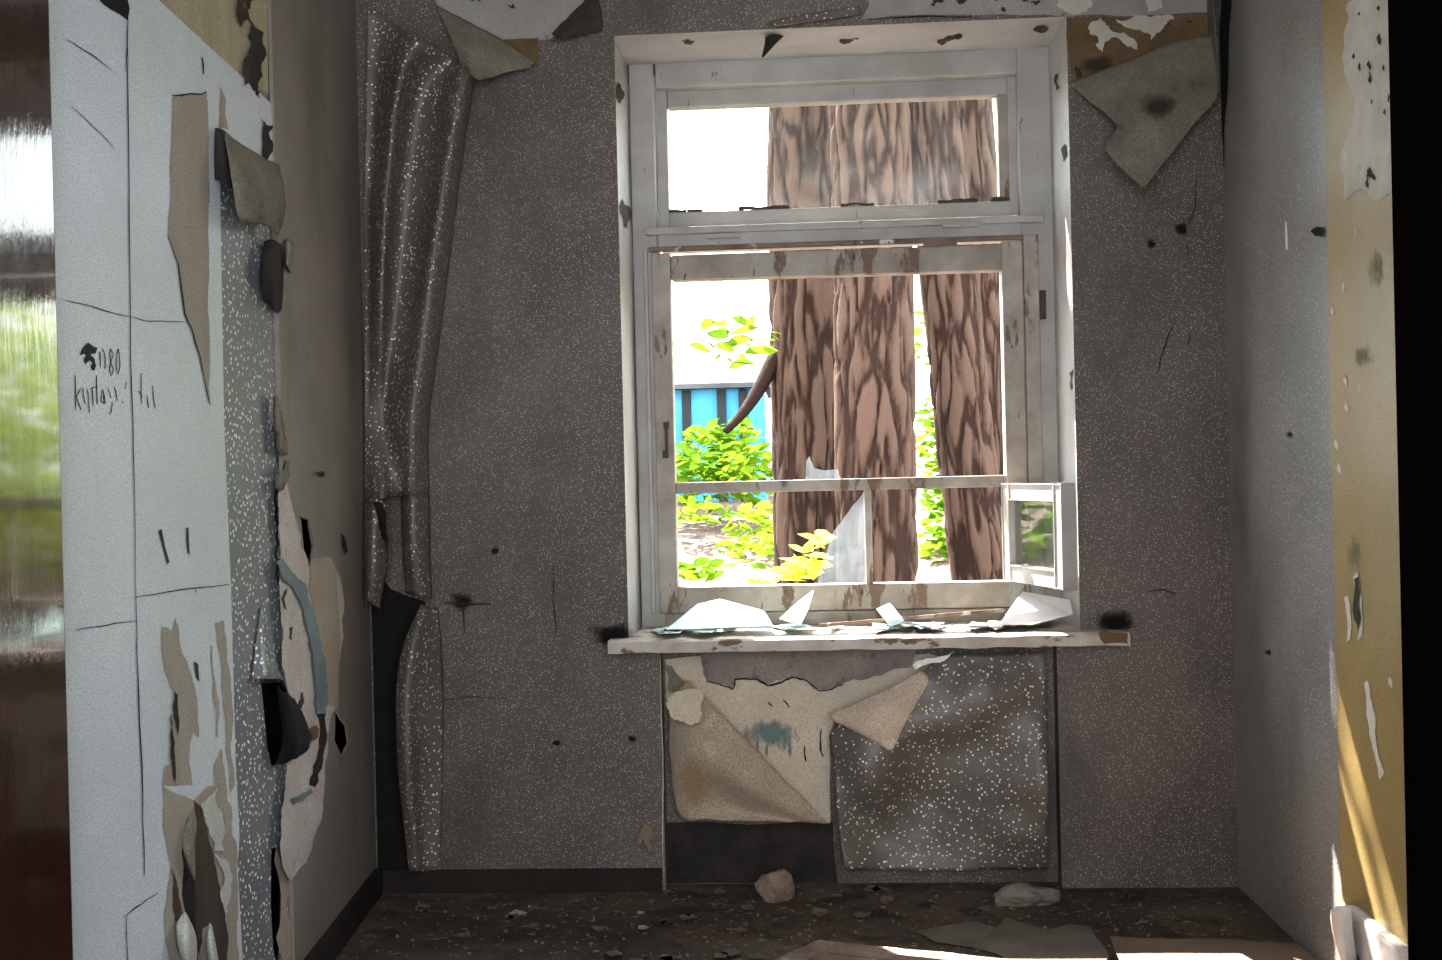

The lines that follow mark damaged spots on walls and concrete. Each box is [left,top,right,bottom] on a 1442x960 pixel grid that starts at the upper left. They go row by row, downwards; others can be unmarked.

flaking render [436,0,584,66]
peeling [168,87,228,403]
peeling [161,619,239,960]
flaking render [261,483,349,879]
flaking render [665,649,939,823]
peeling [1344,572,1363,641]
peeling [1364,681,1384,779]
peeling [1330,906,1361,960]